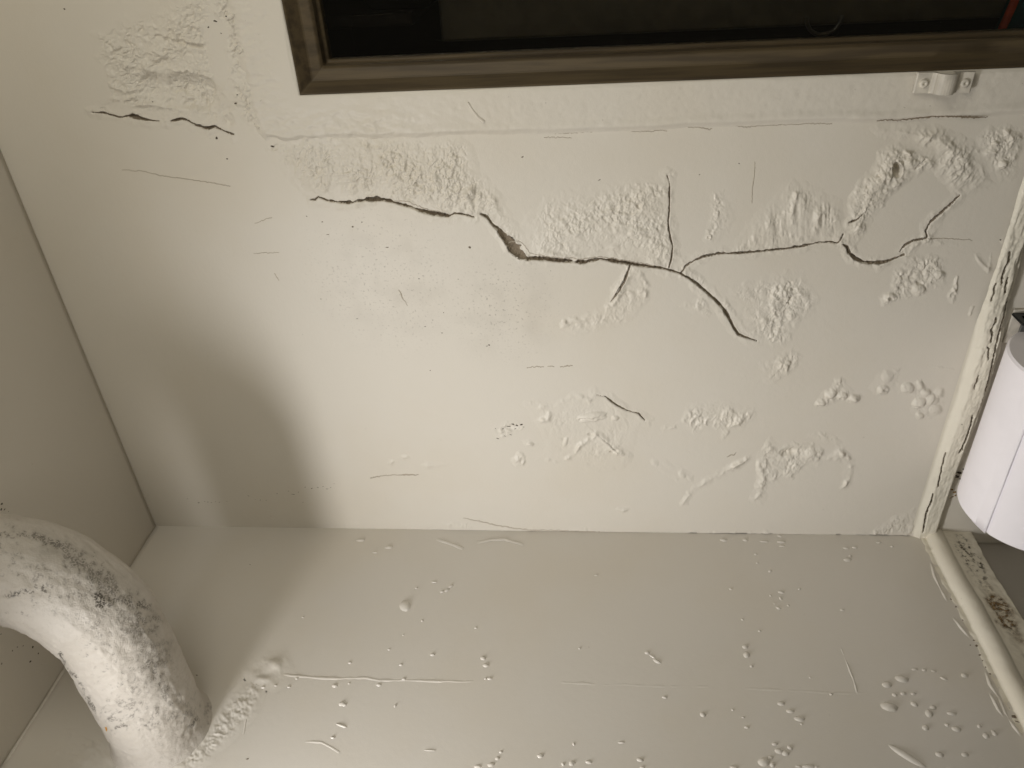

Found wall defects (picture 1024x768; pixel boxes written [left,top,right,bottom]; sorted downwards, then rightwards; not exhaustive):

crack [84,105,238,145]
crack [302,166,972,349]
crack [589,385,655,428]